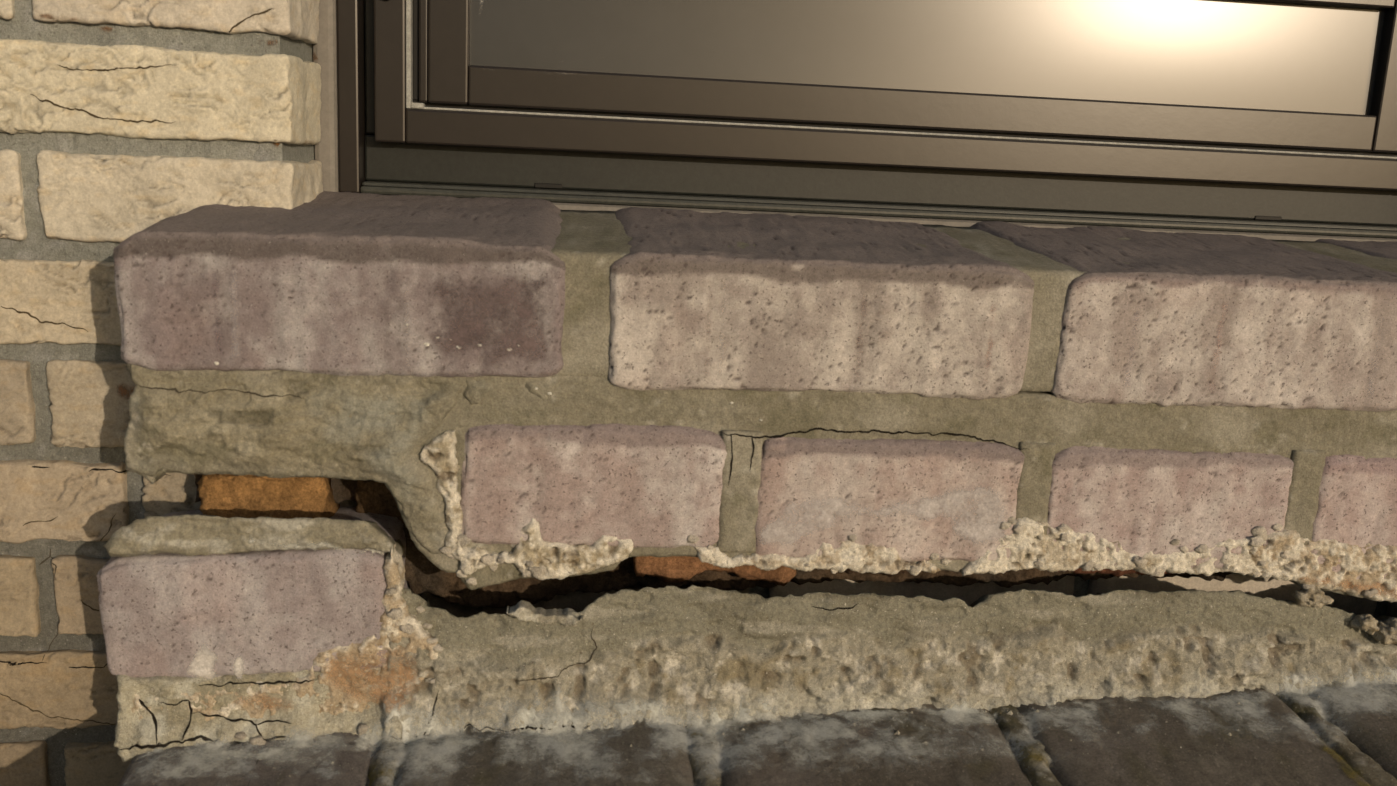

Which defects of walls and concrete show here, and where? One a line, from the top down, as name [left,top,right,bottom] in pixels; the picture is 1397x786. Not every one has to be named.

crack [722,427,1030,481]
spalling [420,430,634,585]
spalling [687,516,1397,603]
crack [0,633,312,785]
water stain [188,647,217,679]
water stain [234,656,244,678]
spalling [181,544,444,746]
water stain [123,689,1106,786]
water stain [1130,667,1397,742]